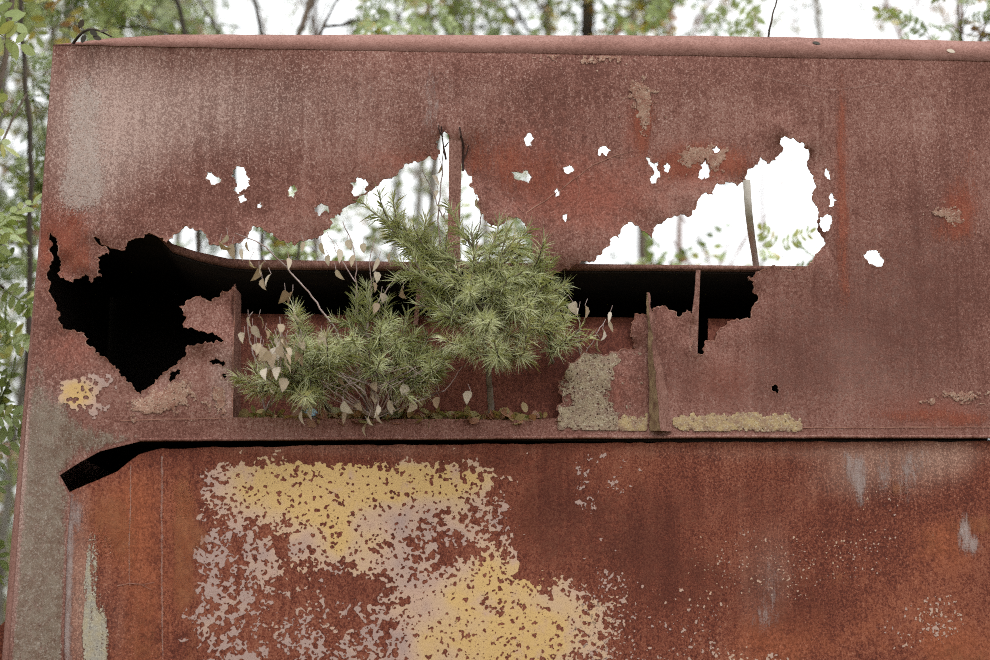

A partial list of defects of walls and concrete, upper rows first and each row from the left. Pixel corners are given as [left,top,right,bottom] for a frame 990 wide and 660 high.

rust [466,135,557,191]
rust [659,144,751,180]
rust [41,210,91,272]
peeling [54,371,117,425]
peeling [178,449,821,660]
peeling [817,529,899,579]
peeling [880,595,962,649]